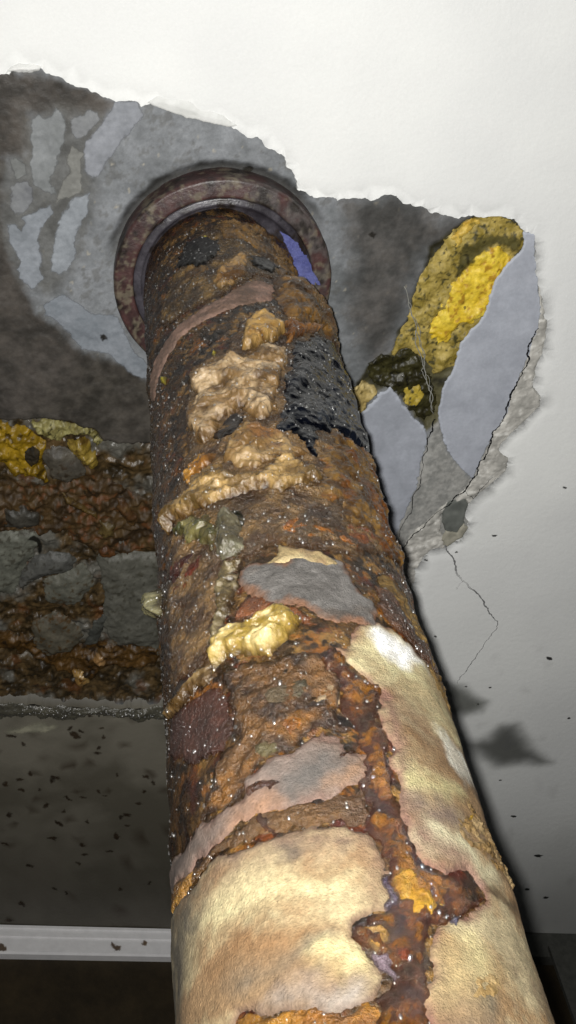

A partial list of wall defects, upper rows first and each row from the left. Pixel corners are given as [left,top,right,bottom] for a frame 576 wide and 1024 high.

spalling [0,63,547,590]
rust [218,218,344,367]
spalling [0,516,163,705]
rust [169,506,244,592]
rust [234,596,274,620]
rust [283,431,405,569]
rust [377,574,452,717]
crack [445,545,498,683]
rust [200,652,351,821]
rust [171,789,370,914]
rust [458,799,515,890]
rust [237,1002,381,1024]